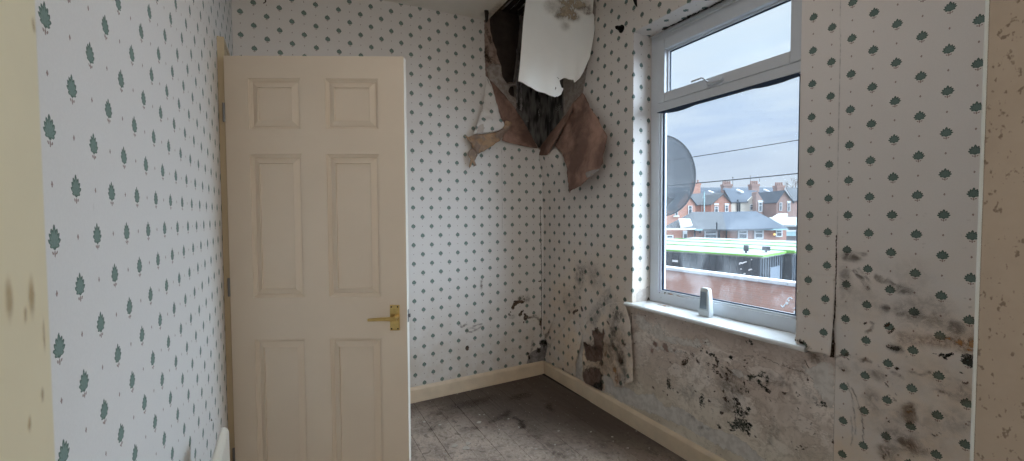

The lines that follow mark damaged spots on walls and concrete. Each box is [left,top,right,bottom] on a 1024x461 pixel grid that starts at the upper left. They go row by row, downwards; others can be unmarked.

flaking render [483,5,524,109]
flaking render [560,60,589,121]
leakage [508,296,539,323]
flaking render [598,307,836,461]
leakage [651,342,827,438]
leakage [932,337,974,384]